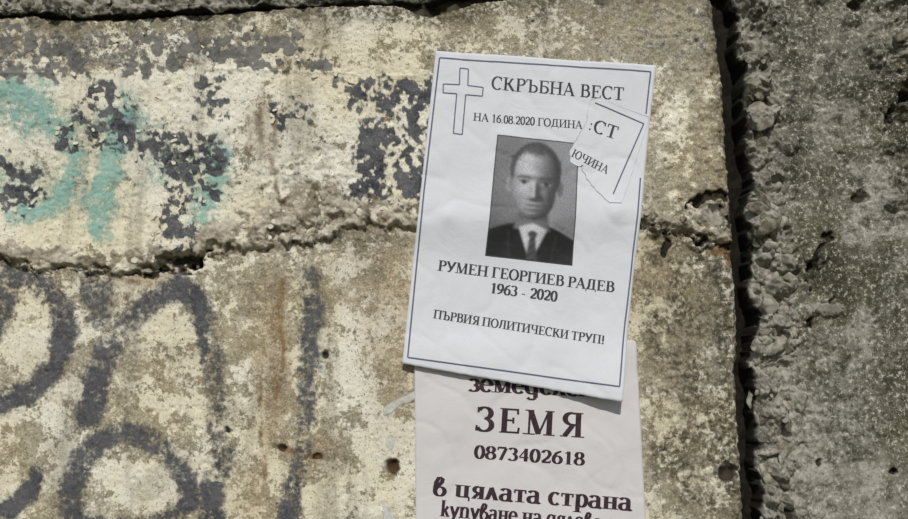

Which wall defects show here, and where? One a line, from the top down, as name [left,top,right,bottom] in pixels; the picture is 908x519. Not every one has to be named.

crack [92,14,179,22]
crack [326,1,366,9]
crack [391,0,507,18]
crack [125,249,213,279]
crack [639,0,754,519]
crack [14,267,92,284]